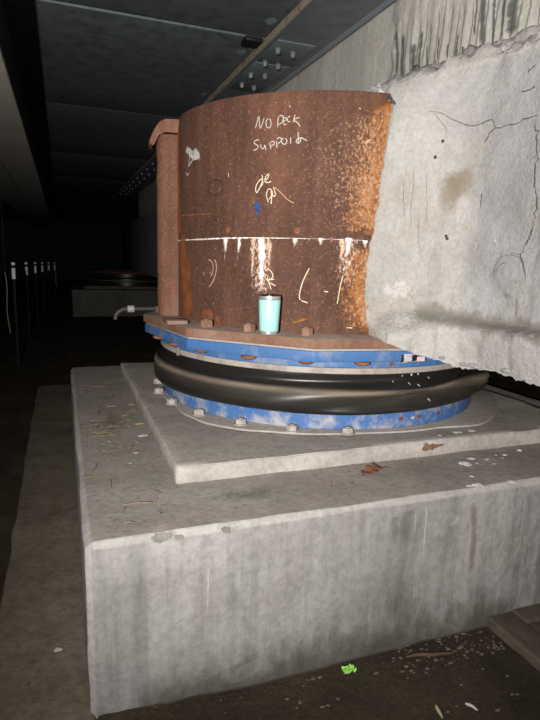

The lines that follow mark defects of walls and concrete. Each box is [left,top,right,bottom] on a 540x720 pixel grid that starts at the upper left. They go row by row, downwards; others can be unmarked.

water stain [395,33,428,75]
water stain [474,0,517,42]
corrosion [177,128,209,318]
efflorescence [178,237,368,294]
corrosion [338,247,369,332]
corrosion [324,104,391,233]
crack [429,111,540,280]
spalling [152,532,184,543]